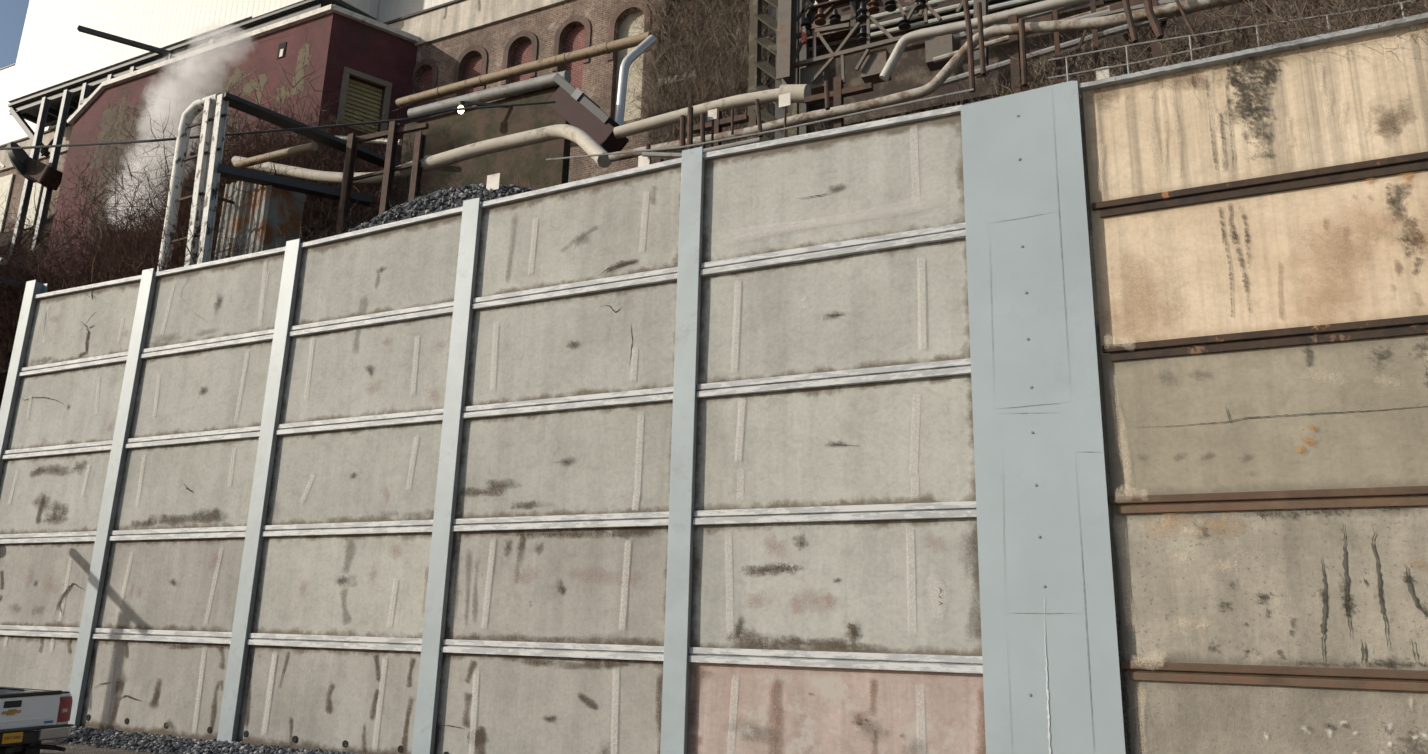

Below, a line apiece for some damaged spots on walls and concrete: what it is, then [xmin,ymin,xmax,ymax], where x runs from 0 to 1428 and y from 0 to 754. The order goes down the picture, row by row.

damp [1176,57,1280,167]
damp [1219,206,1250,316]
damp [1386,184,1424,274]
crack [1148,406,1428,427]